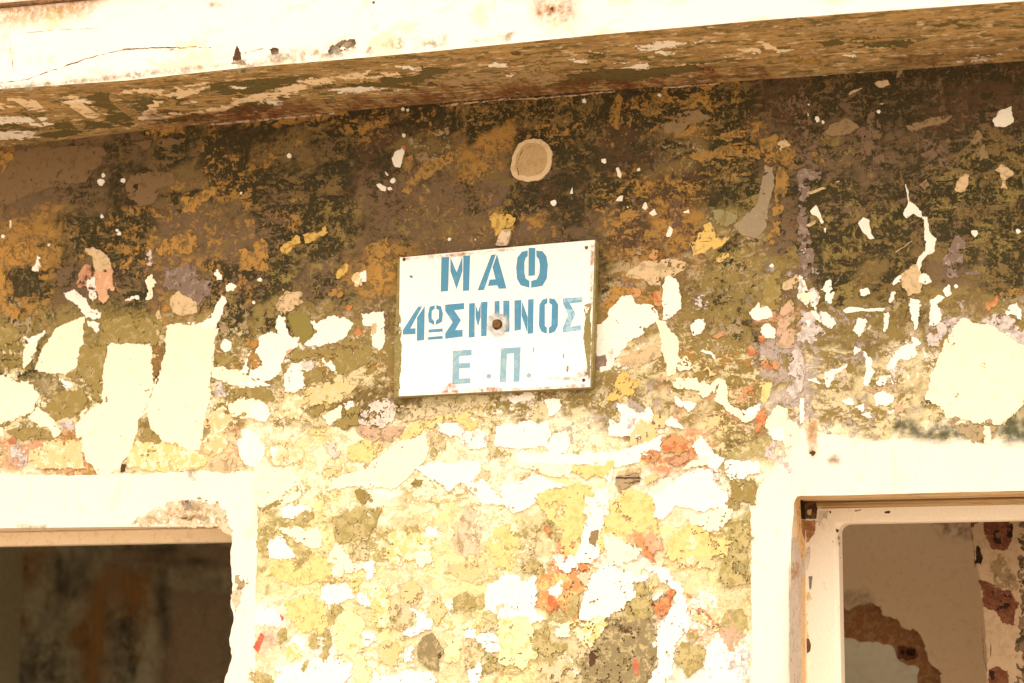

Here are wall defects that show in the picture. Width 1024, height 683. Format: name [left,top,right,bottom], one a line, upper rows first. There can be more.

peeling [0,39,716,205]
peeling [737,41,825,65]
peeling [776,19,972,58]
peeling [875,70,903,88]
peeling [992,106,1014,127]
peeling [837,230,1024,426]
peeling [0,73,885,683]
spalling [844,602,942,683]
flaking render [970,521,1024,683]